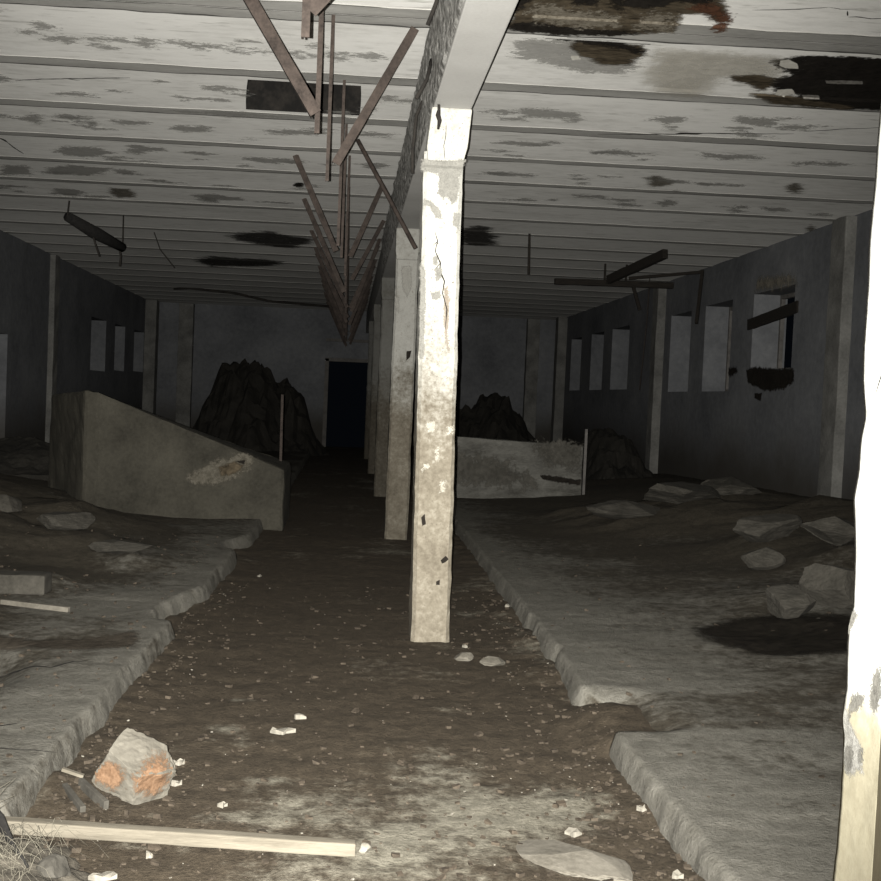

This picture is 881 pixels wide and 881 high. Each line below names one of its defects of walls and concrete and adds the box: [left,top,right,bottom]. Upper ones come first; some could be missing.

leakage [507,0,733,37]
leakage [231,230,318,248]
crack [435,233,447,329]
spalling [746,366,794,401]
spalling [186,453,253,485]